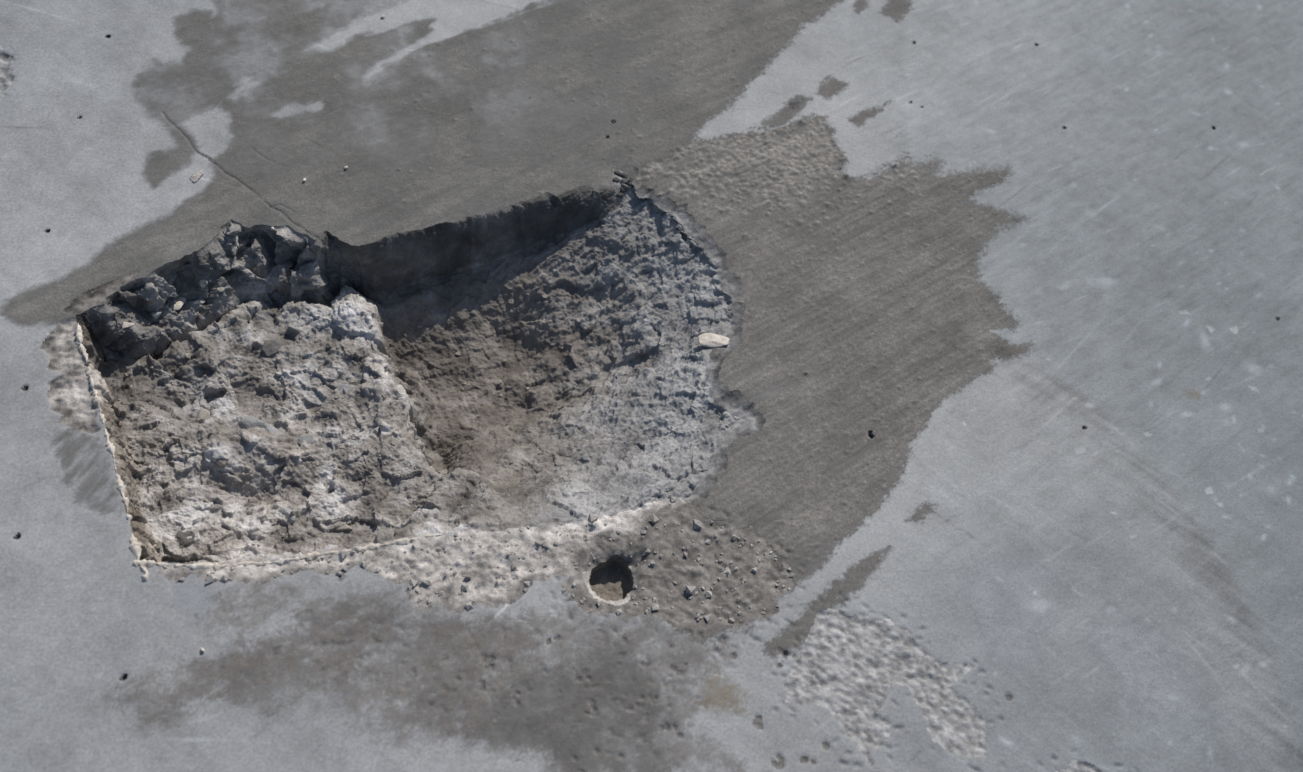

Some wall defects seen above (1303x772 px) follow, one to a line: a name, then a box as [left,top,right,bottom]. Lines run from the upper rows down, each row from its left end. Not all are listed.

spalling [0,45,18,92]
crack [163,112,318,239]
spalling [40,271,138,434]
spalling [151,167,796,659]
leakage [2,0,1033,597]
leakage [182,597,769,772]
leakage [764,545,890,657]
spalling [776,607,988,767]
leakage [957,559,1055,666]